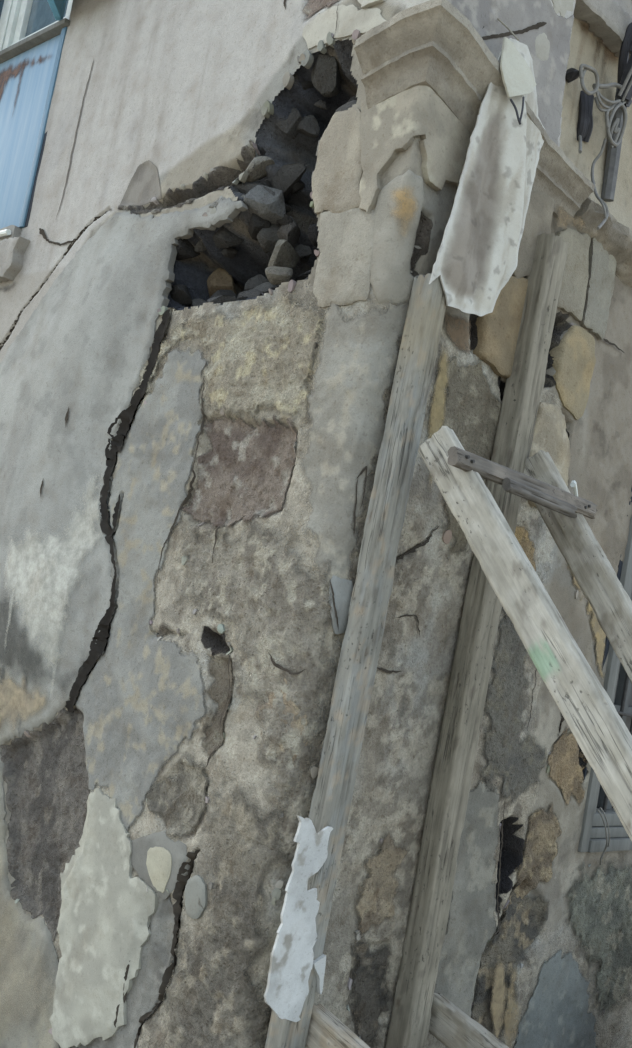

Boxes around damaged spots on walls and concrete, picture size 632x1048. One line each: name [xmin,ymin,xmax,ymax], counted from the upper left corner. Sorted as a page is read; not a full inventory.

corrosion [0,56,45,103]
flaking render [448,0,574,146]
crack [65,309,170,712]
spalling [0,0,472,1048]
spalling [471,728,588,1038]